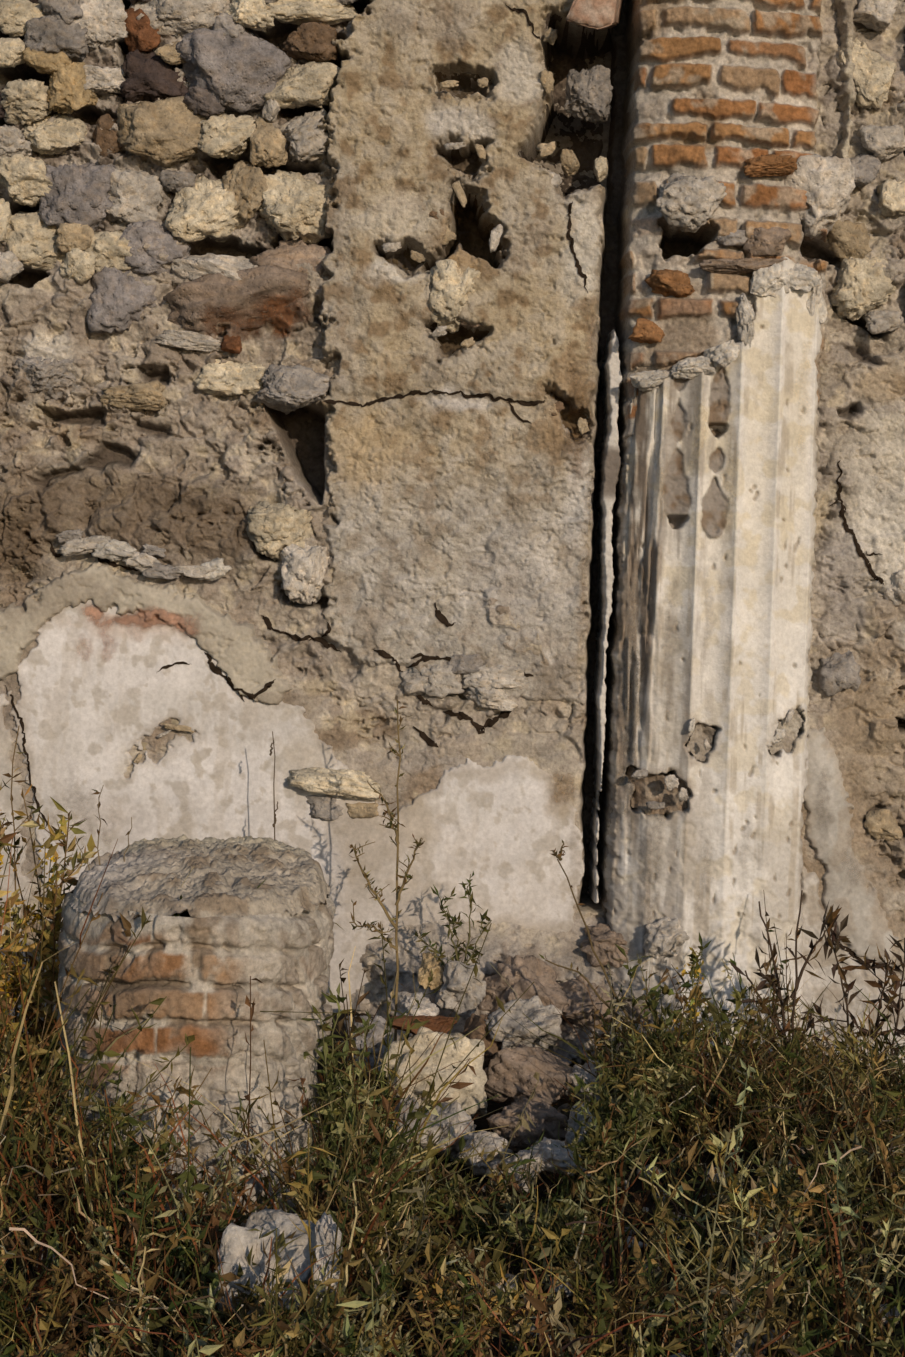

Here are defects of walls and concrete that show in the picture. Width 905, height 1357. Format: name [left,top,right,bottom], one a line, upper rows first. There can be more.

crack [324,389,546,423]
spalling [687,717,716,761]
spalling [769,709,804,754]
spalling [626,766,691,815]